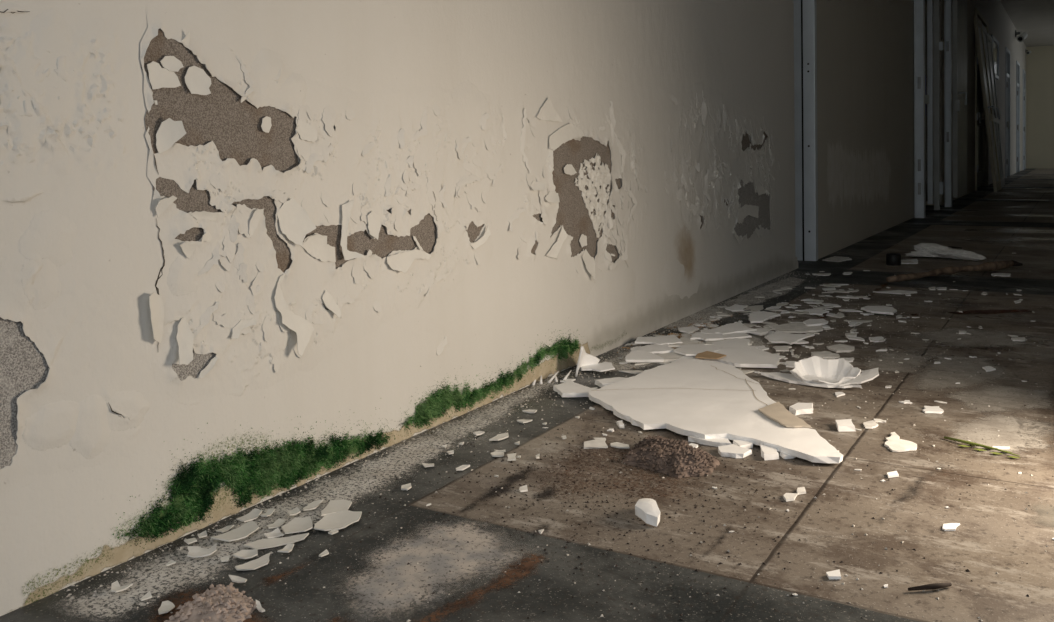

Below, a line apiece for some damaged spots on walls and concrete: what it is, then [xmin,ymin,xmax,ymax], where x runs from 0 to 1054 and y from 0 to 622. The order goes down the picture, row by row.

peeling [0,317,49,469]
peeling [149,292,164,344]
crack [155,219,165,295]
peeling [172,317,218,381]
peeling [141,29,318,173]
peeling [153,177,436,356]
leakage [23,250,798,617]
peeling [530,97,621,280]
peeling [724,180,770,245]
peeling [741,130,768,156]